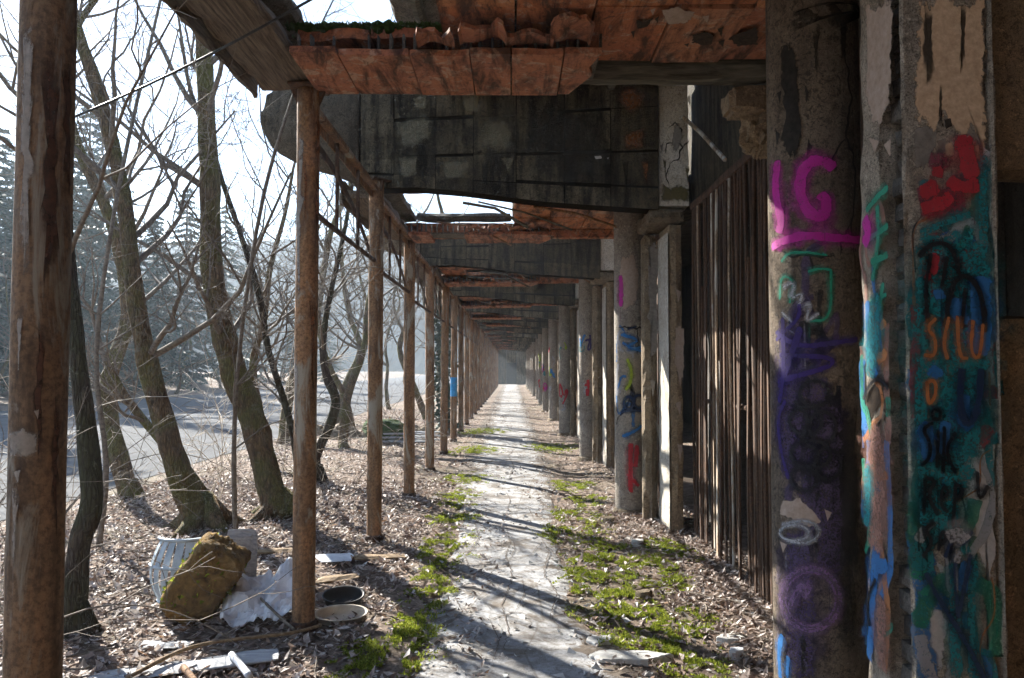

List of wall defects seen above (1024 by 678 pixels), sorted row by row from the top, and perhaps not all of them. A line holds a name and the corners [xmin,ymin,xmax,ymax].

corrosion [303,122,320,224]
leakage [400,159,416,176]
leakage [399,96,429,145]
leakage [529,100,607,185]
crack [665,122,689,184]
spalling [739,42,812,160]
flaking render [915,0,987,161]